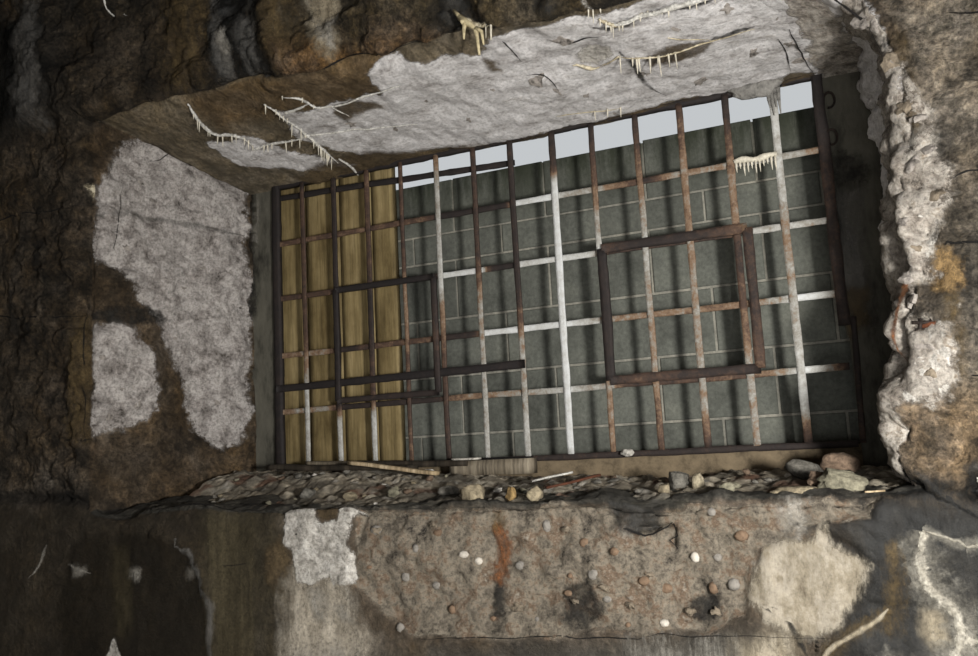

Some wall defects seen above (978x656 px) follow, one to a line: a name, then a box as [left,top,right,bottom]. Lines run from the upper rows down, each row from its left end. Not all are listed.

water stain [0,5,36,123]
efflorescence [307,0,340,49]
water stain [334,100,382,120]
water stain [297,145,491,184]
water stain [593,105,665,126]
water stain [645,41,712,66]
spalling [90,139,255,448]
spalling [207,0,960,486]
rust [493,518,513,631]
spalling [283,496,876,640]
crack [914,530,978,656]